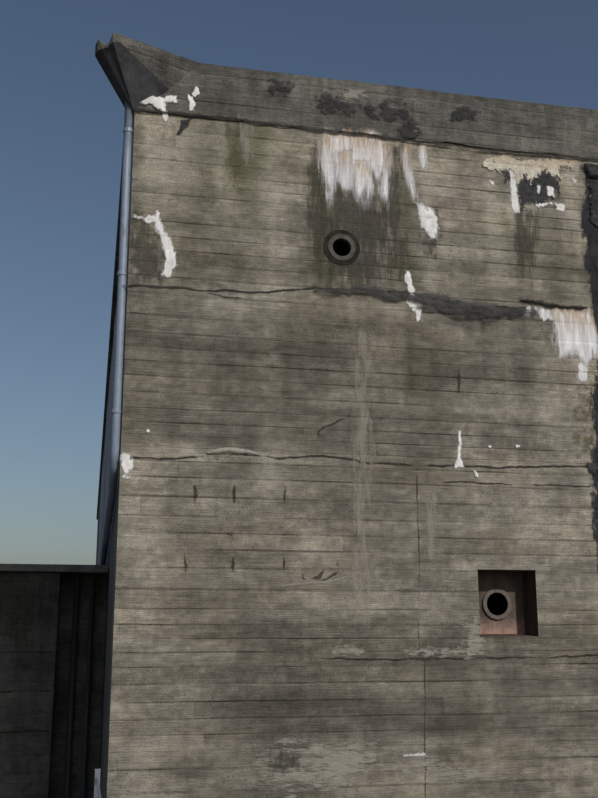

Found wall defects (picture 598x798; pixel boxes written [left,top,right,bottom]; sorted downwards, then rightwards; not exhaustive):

crack [122,284,348,298]
water stain [308,127,442,321]
spalling [483,155,598,226]
crack [495,299,588,311]
water stain [524,166,598,570]
crack [118,412,592,577]
crack [327,624,598,798]